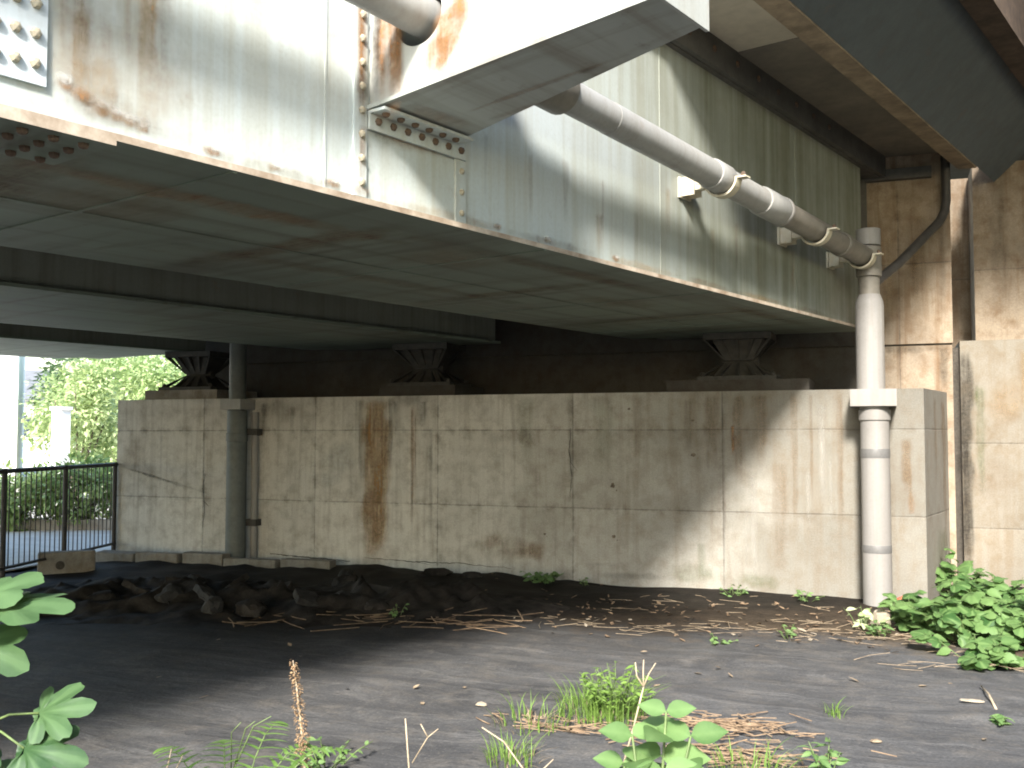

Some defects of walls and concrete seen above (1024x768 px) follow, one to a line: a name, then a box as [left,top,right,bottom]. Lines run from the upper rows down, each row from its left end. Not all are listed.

corrosion [429,0,465,65]
water stain [961,398,970,475]